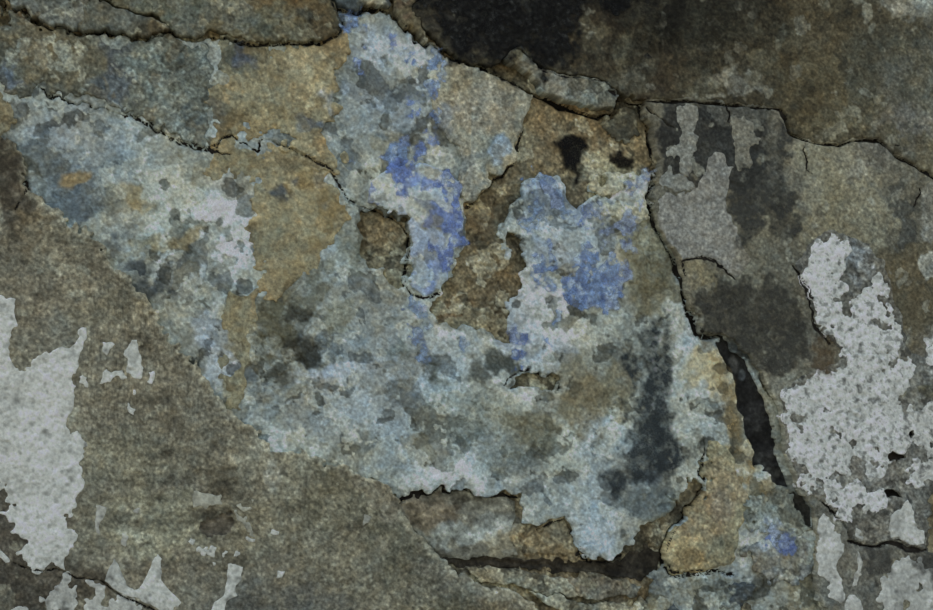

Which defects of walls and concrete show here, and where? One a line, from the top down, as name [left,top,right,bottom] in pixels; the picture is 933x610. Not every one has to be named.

spalling [179,37,320,86]
crack [210,2,451,61]
spalling [0,81,267,409]
crack [122,114,442,299]
spalling [231,12,933,610]
crack [474,51,933,345]
crack [20,565,155,610]
peeling [0,295,181,610]
peeling [188,491,255,610]
crack [399,484,518,504]
crack [536,520,623,567]
crack [659,447,734,579]